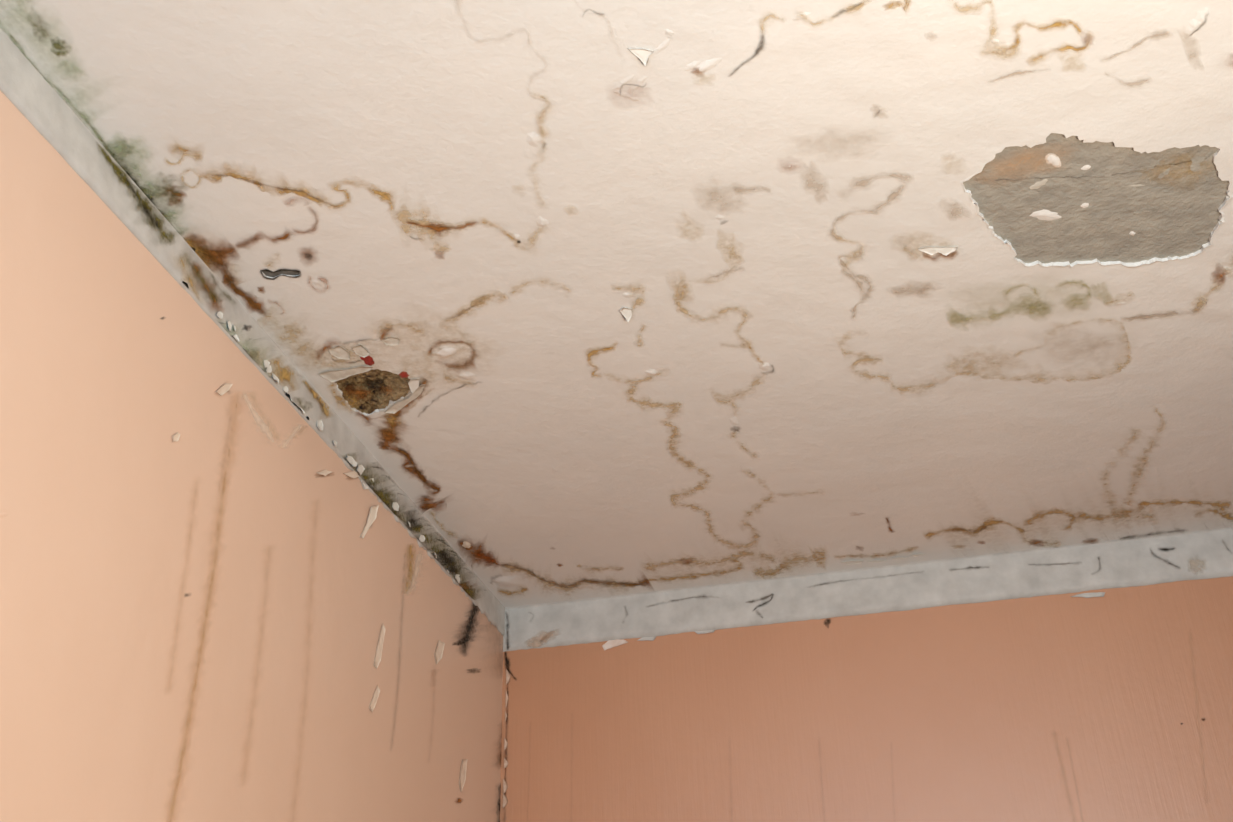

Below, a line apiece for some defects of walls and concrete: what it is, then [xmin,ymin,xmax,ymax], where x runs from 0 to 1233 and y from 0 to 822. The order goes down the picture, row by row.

leakage [34,25,65,55]
leakage [1040,21,1081,32]
leakage [81,115,262,242]
leakage [278,188,319,203]
leakage [372,190,487,251]
peeling [960,133,1233,268]
leakage [455,291,515,319]
flaking render [317,340,427,422]
leakage [348,455,478,652]
leakage [625,369,824,587]
leakage [926,520,1003,544]
leakage [1017,460,1233,544]